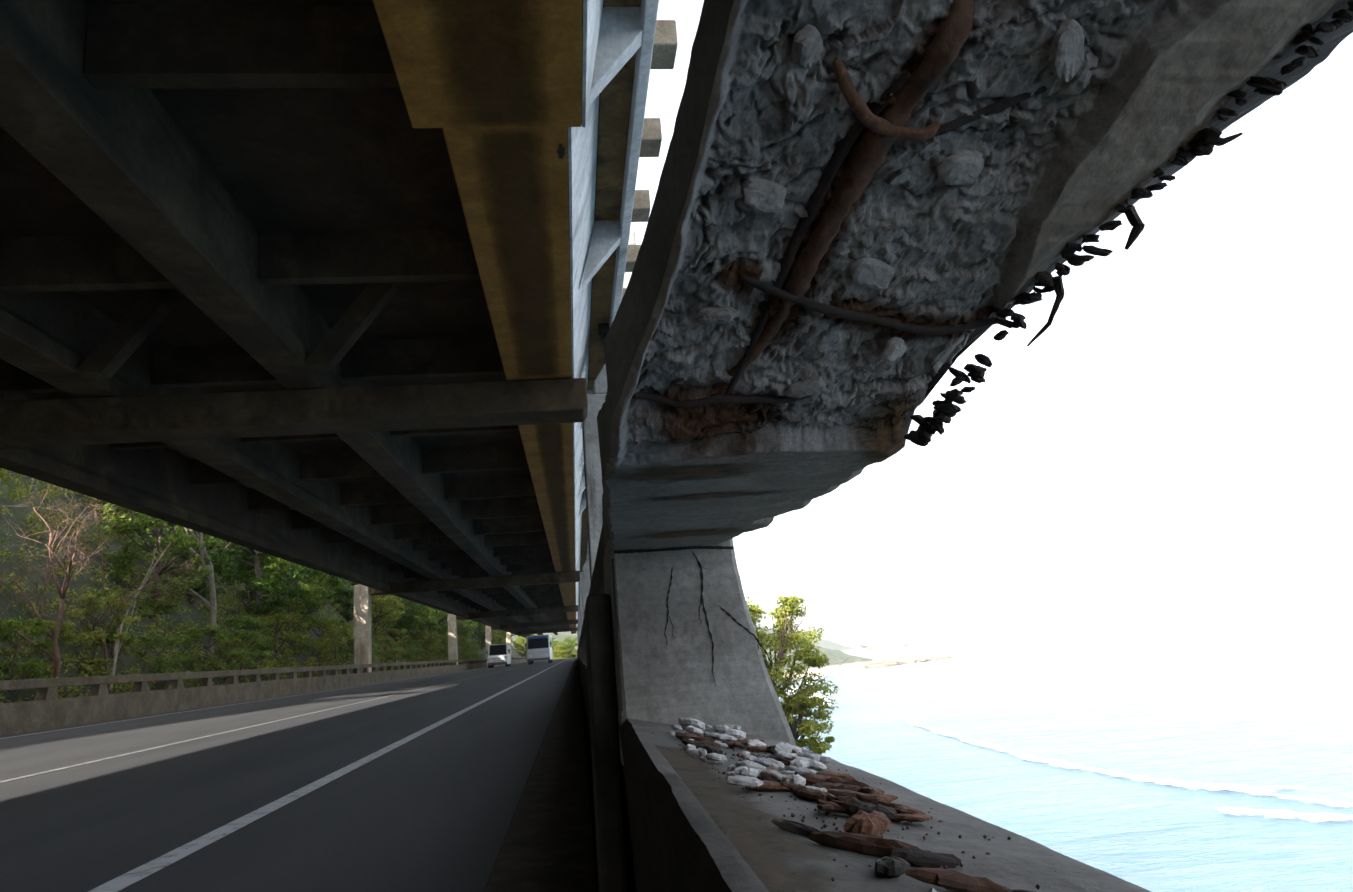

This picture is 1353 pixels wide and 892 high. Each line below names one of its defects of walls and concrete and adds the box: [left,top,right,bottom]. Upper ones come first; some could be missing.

corrosion [867,7,951,107]
corrosion [717,127,1000,346]
spalling [615,0,1353,467]
corrosion [651,382,781,460]
crack [614,546,775,686]